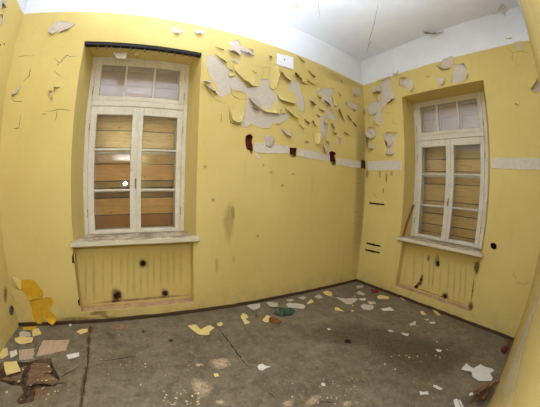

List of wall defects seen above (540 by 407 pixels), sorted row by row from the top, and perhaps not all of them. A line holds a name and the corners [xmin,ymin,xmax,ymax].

peeling [47,20,77,34]
peeling [426,55,469,88]
peeling [203,40,414,162]
rust [106,290,167,303]
peeling [0,277,60,380]